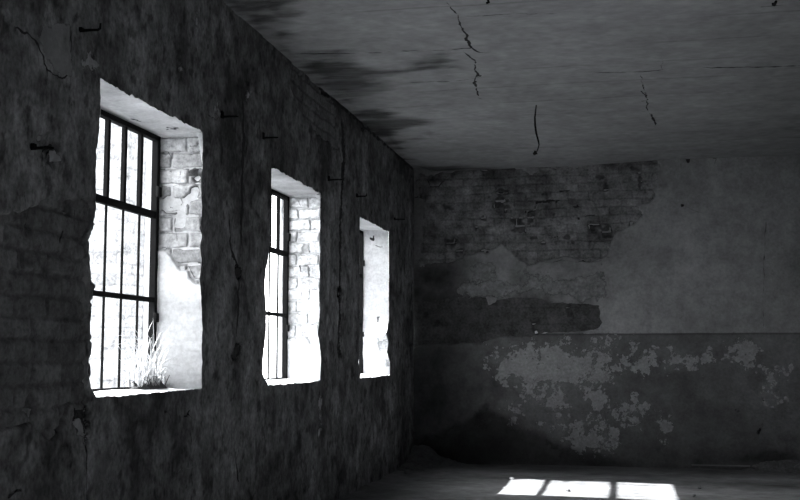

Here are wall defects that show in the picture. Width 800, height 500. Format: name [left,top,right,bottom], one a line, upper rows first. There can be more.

leakage [308,61,400,92]
leakage [353,110,428,149]
crack [412,3,482,99]
crack [640,66,662,125]
flaking render [159,127,204,284]
flaking render [414,160,661,267]
flaking render [414,296,794,458]